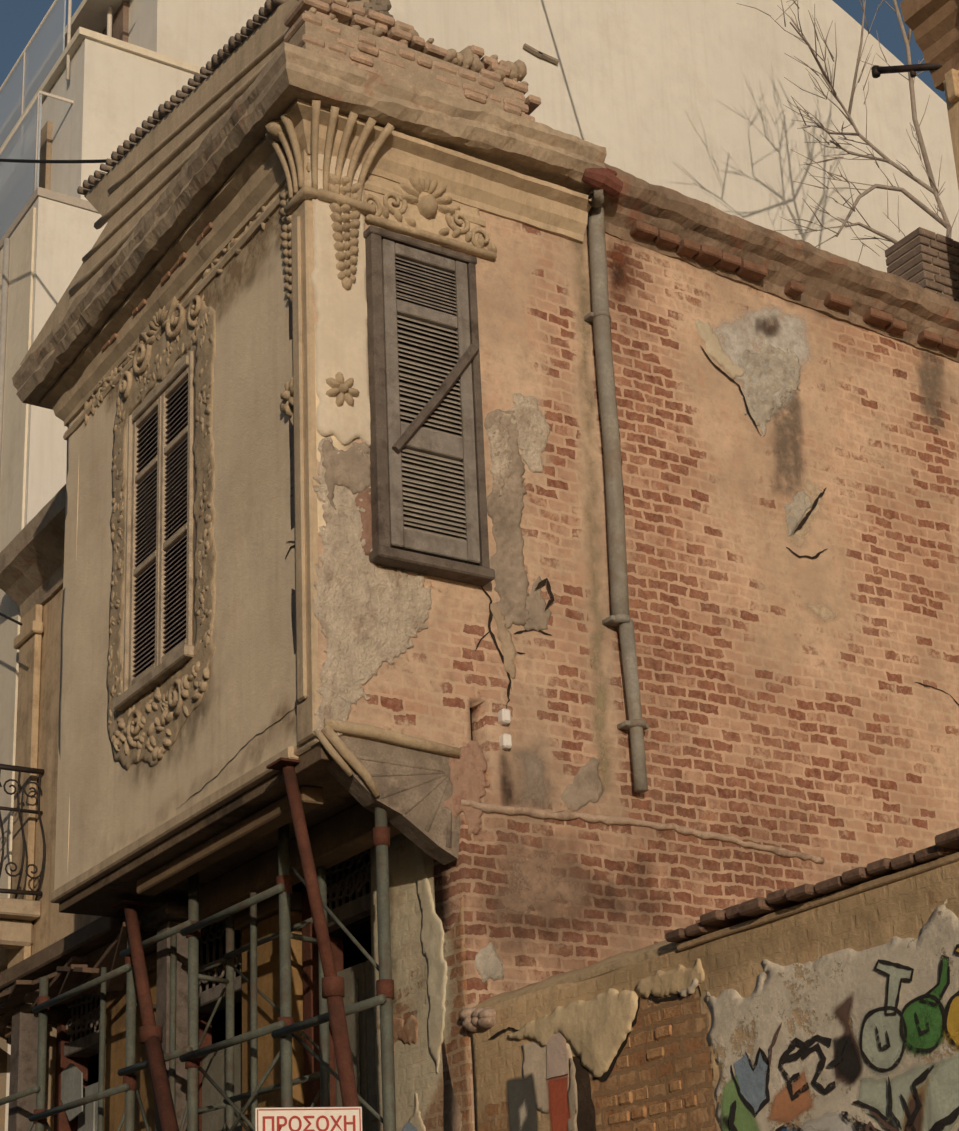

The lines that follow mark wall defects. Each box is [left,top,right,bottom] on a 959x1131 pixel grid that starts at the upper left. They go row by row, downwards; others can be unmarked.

flaking render [784,280,804,298]
spalling [695,308,809,437]
peeling [486,393,550,497]
damp [774,391,802,490]
peeling [312,436,432,736]
crack [475,586,525,709]
spalling [514,576,555,635]
crack [916,682,959,706]
peeling [393,844,447,1073]
peeling [507,900,959,1131]
peeling [402,1093,426,1131]